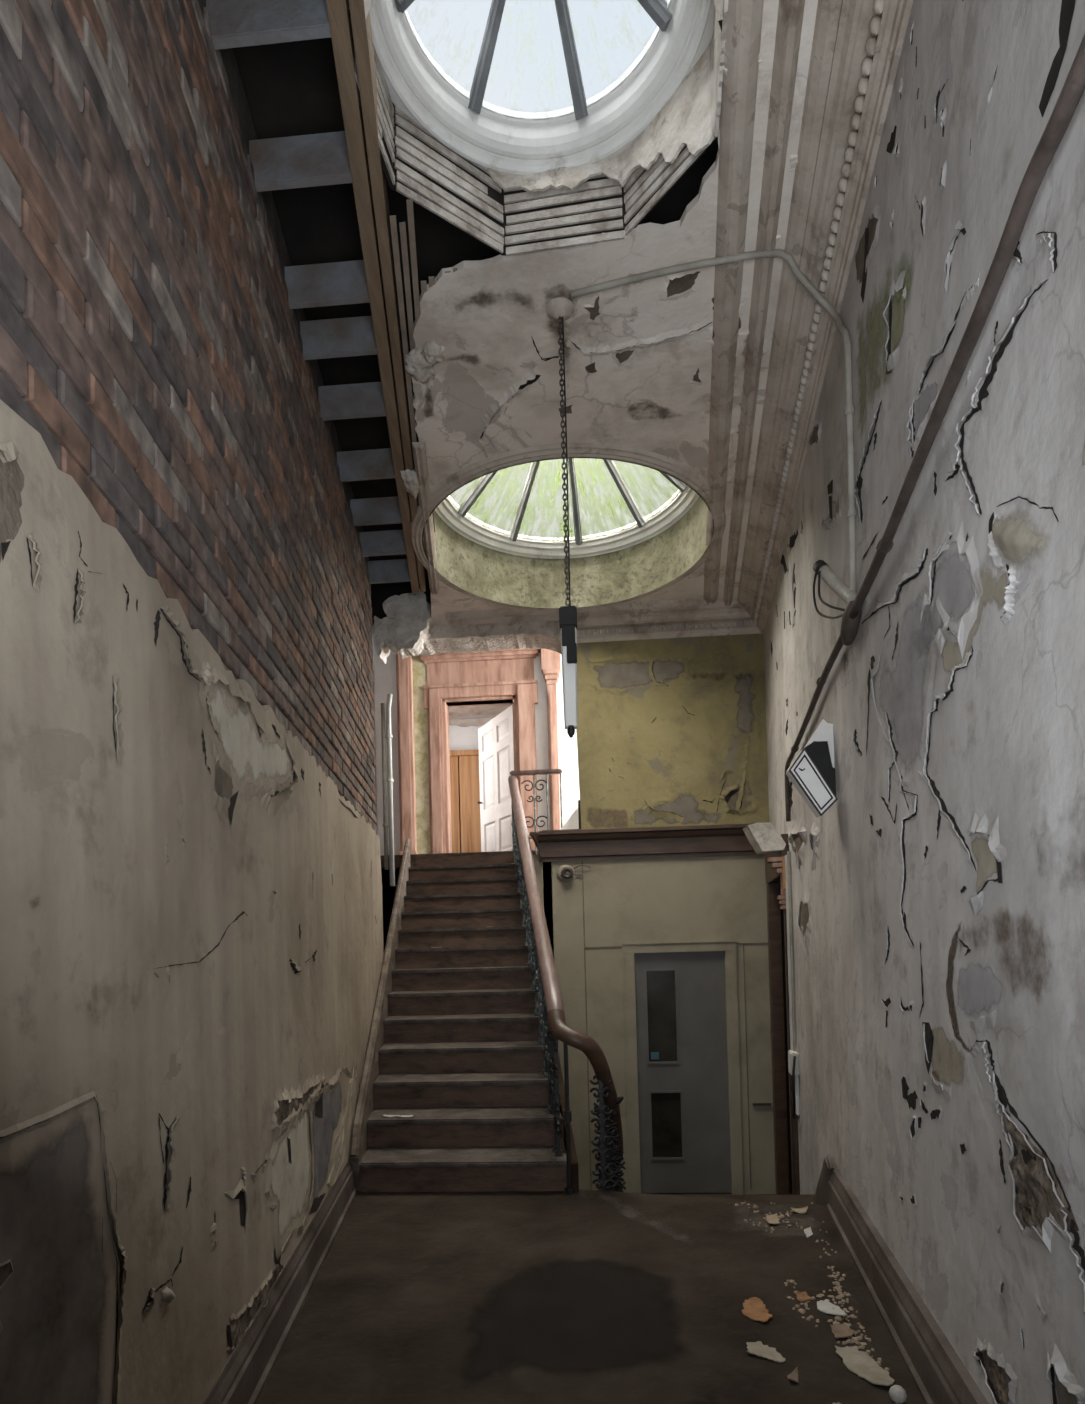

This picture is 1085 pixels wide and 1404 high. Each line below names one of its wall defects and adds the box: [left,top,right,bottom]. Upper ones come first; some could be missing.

spalling [1039,0,1075,118]
peeling [0,441,24,563]
peeling [917,520,1007,676]
peeling [199,660,295,824]
peeling [881,996,964,1142]
peeling [0,1091,120,1404]
peeling [224,1065,357,1353]
crack [971,1040,1085,1314]
spalling [996,1109,1085,1253]
water stain [464,1261,682,1381]
peeling [973,1336,1017,1404]
peeling [1046,1343,1085,1404]